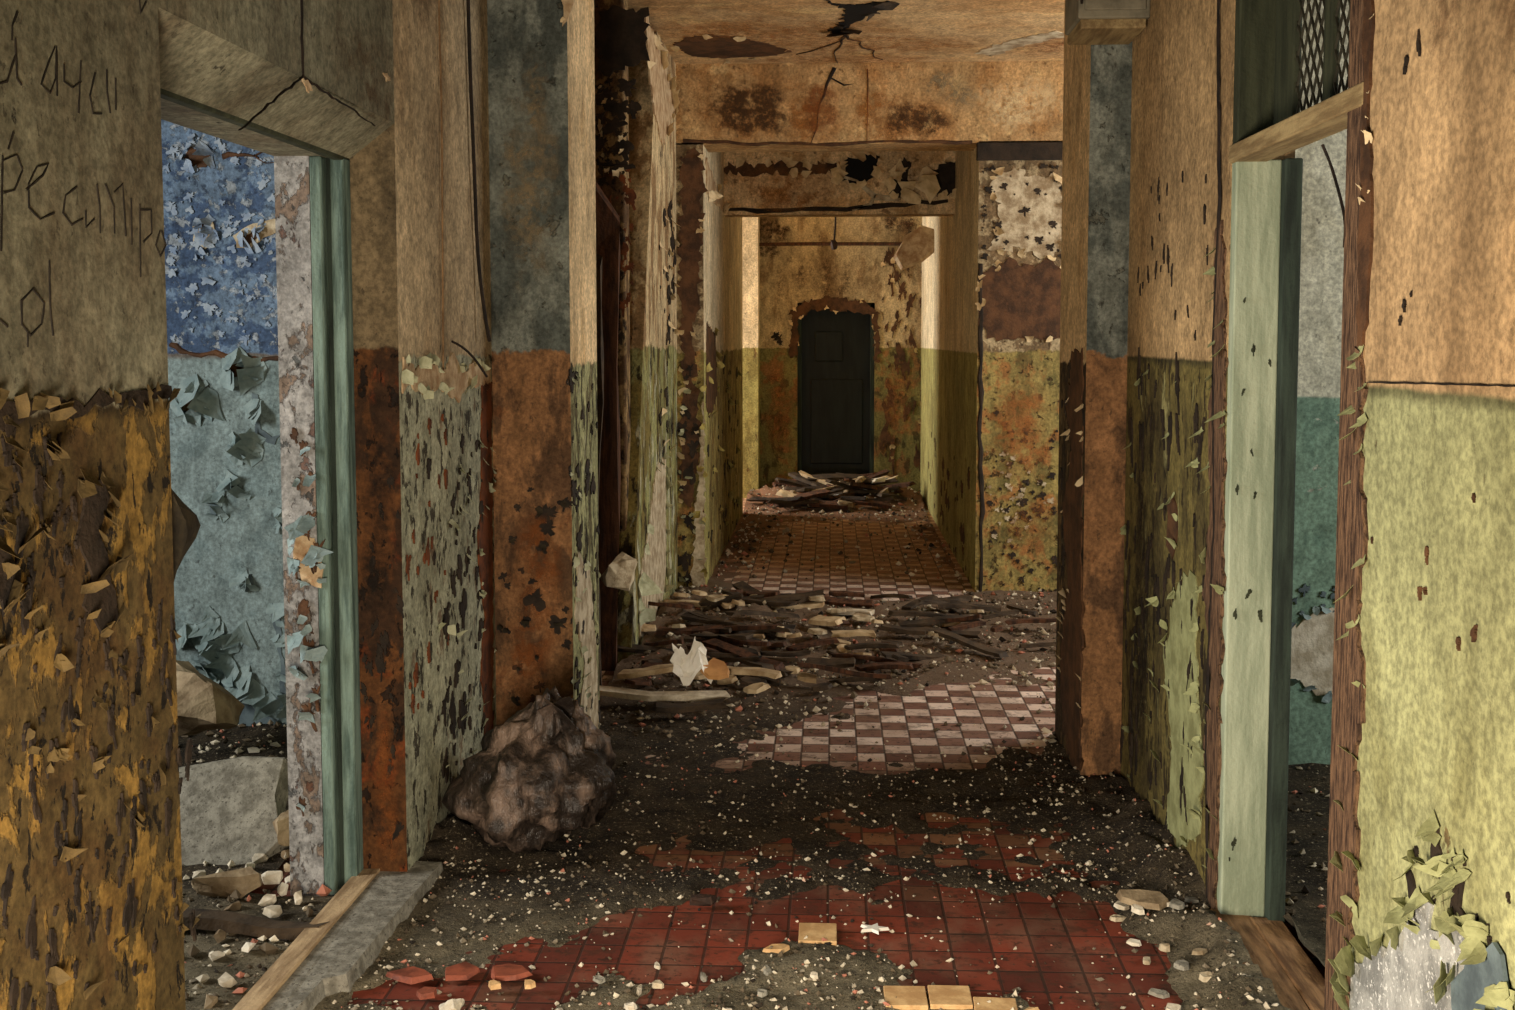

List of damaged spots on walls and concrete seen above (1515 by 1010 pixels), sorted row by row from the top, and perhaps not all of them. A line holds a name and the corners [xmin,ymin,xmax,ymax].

spalling [426,430,601,783]
spalling [560,0,575,27]
peeling [566,368,598,443]
spalling [595,5,792,317]
leakage [720,87,820,137]
peeling [638,148,957,645]
leakage [890,103,946,132]
spalling [771,246,1085,771]
spalling [975,163,1062,342]
peeling [1137,171,1184,296]
peeling [1119,204,1263,910]
spalling [1290,0,1515,1010]